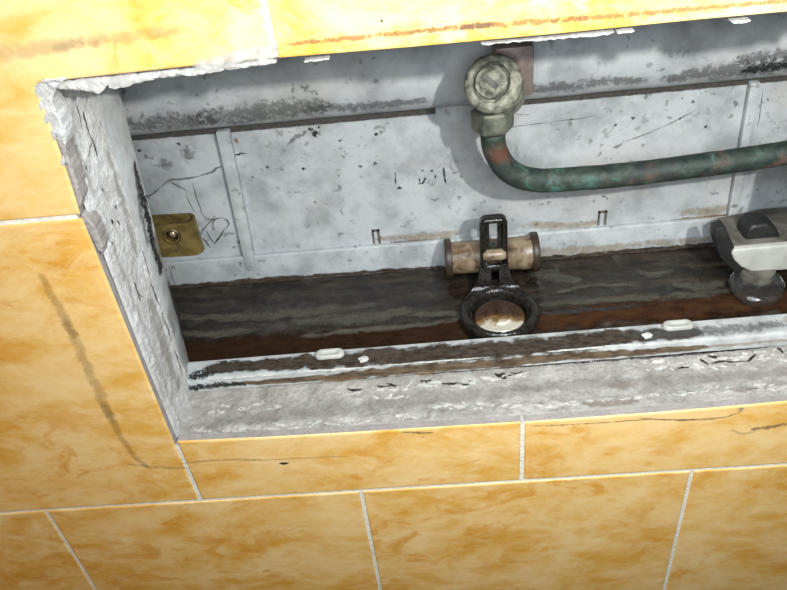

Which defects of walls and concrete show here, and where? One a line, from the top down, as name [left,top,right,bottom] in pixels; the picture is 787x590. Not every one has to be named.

leakage [523,50,787,105]
leakage [127,99,445,340]
crack [678,347,783,369]